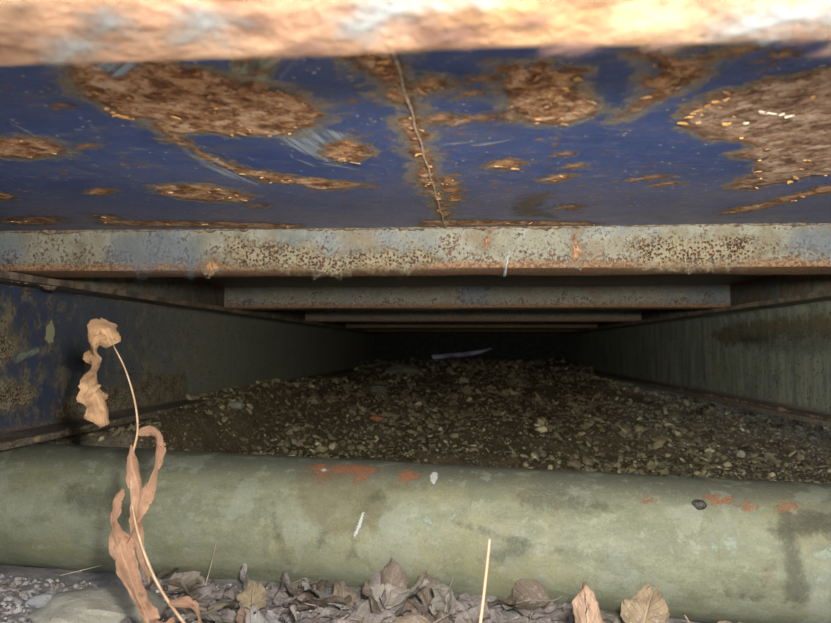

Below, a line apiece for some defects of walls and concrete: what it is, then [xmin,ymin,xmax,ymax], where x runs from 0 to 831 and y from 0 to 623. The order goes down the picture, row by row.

corrosion [0,37,831,278]